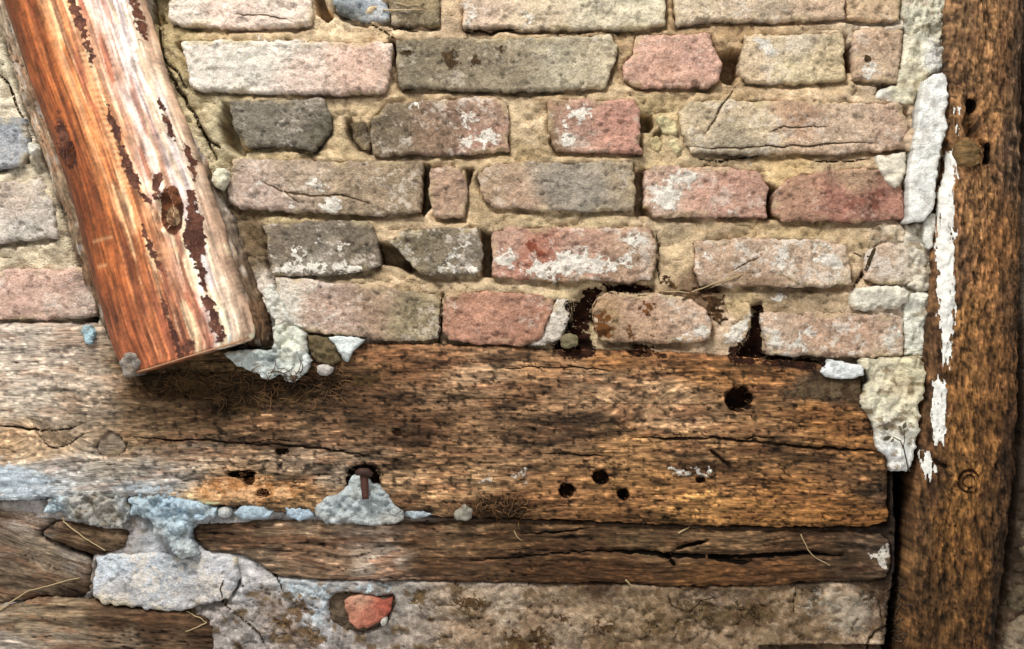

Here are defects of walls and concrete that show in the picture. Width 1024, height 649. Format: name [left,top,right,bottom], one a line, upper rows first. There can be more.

crack [159,25,218,157]
leakage [561,103,592,147]
crack [696,86,874,163]
leakage [643,165,697,210]
flaking render [820,31,961,481]
leakage [489,231,654,360]
rust [593,301,667,358]
crack [633,435,875,467]
crack [476,528,841,565]